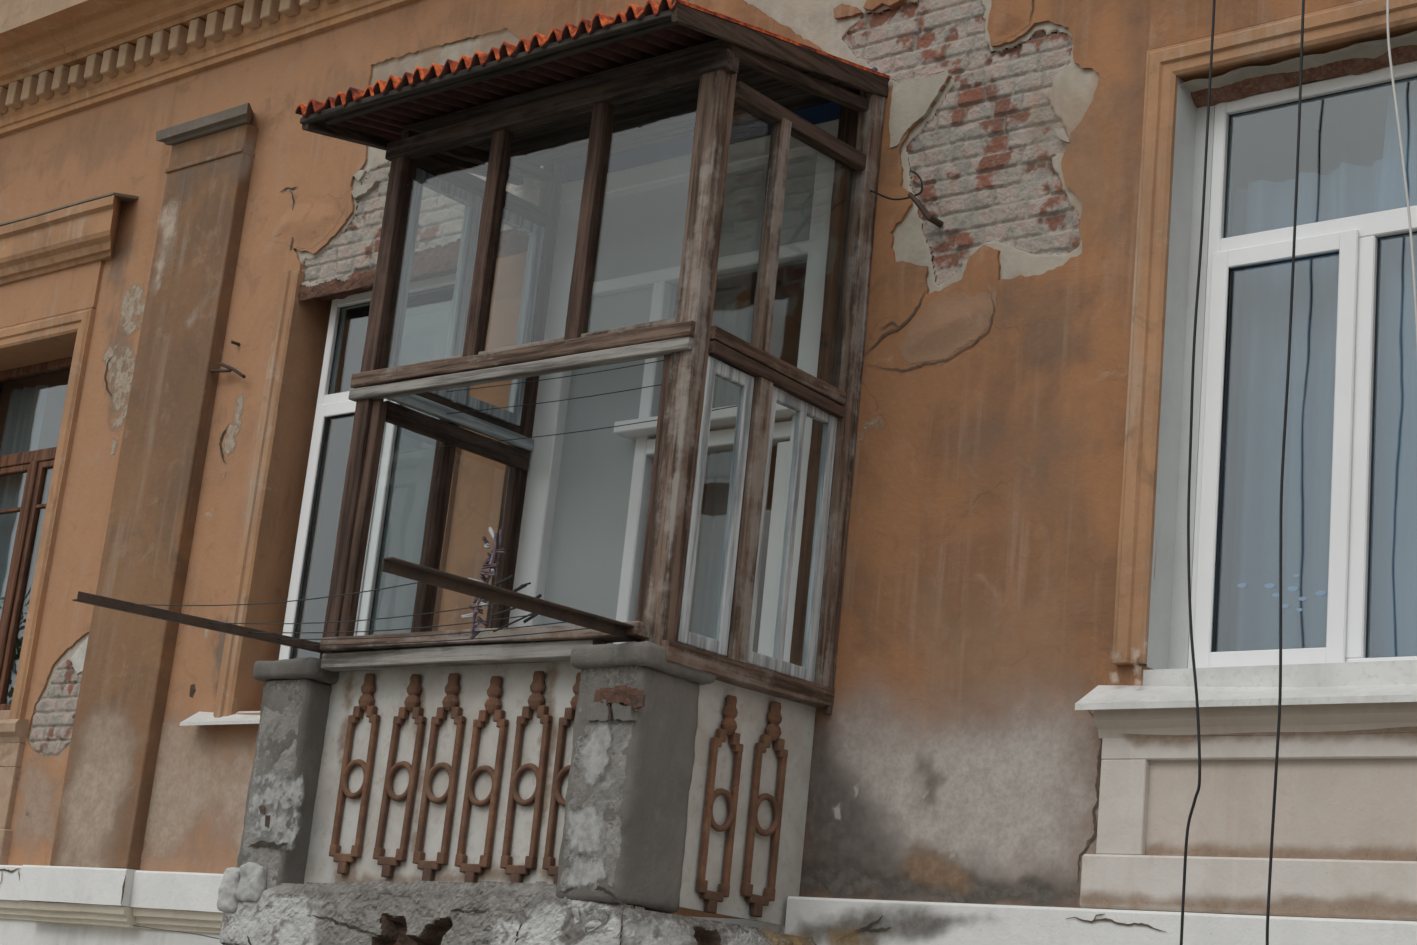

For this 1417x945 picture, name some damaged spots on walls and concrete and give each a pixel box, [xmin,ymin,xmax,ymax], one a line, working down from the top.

peeling [370,29,521,86]
peeling [744,0,1099,294]
peeling [295,146,391,301]
crack [864,292,994,371]
peeling [29,633,89,757]
peeling [248,773,303,849]
spalling [371,913,453,945]
peeling [559,805,609,945]
spalling [580,685,646,785]
leakage [800,710,1099,945]
crack [1077,710,1102,883]
crack [1065,914,1165,932]